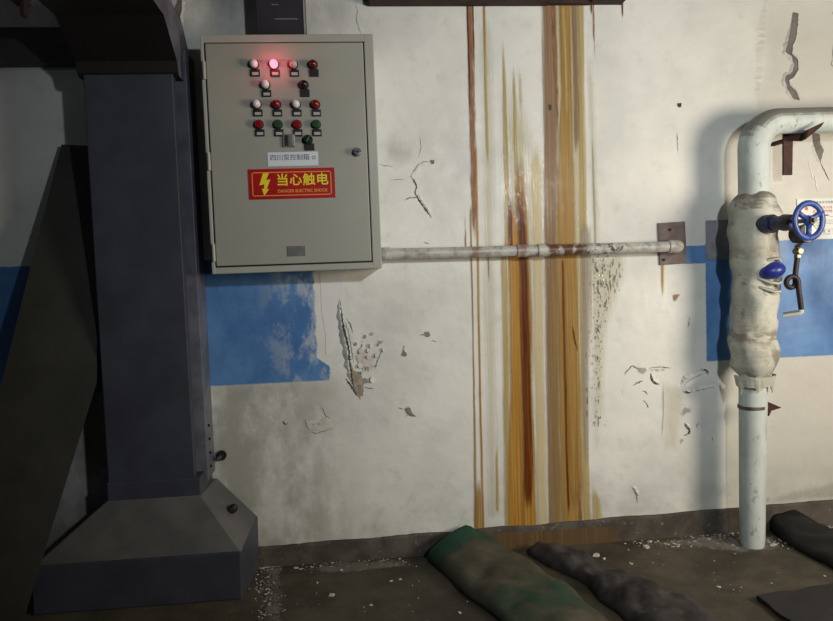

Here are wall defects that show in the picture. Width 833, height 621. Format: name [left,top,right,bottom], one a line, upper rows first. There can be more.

crack [380,141,434,217]
corrosion [465,6,488,247]
corrosion [503,5,596,246]
spalling [781,12,801,101]
peeling [336,300,385,400]
corrosion [471,254,618,550]
water stain [586,254,623,426]